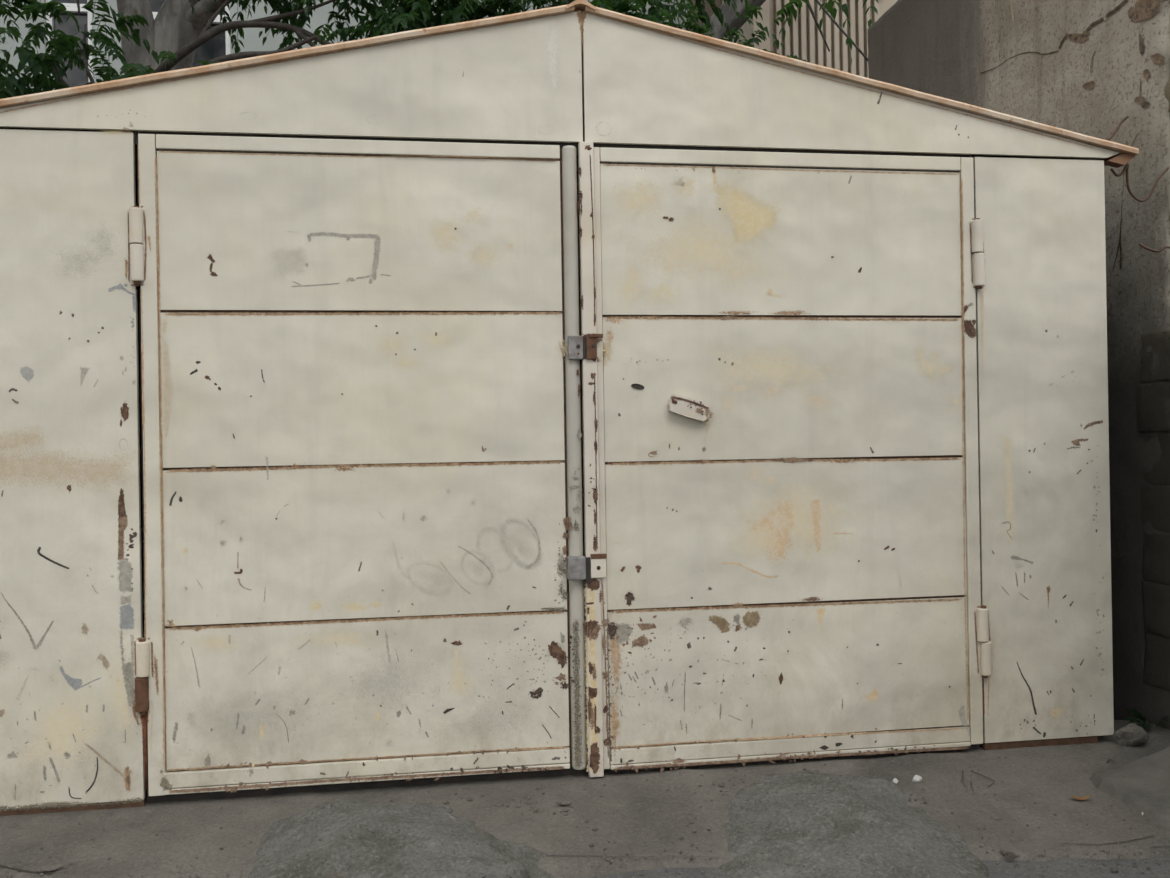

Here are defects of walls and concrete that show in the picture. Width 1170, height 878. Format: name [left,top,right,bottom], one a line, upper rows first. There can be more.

corrosion [0,110,570,794]
corrosion [576,145,998,775]
corrosion [558,517,573,597]
peeling [607,615,705,745]
peeling [708,611,761,651]